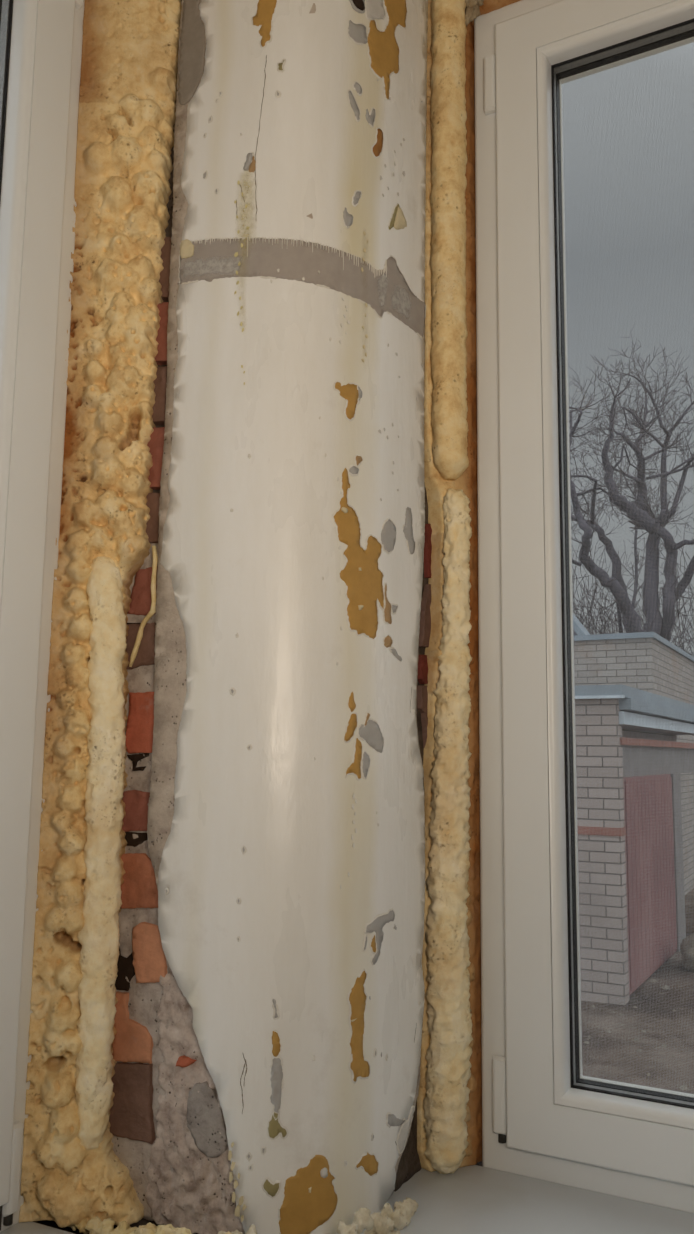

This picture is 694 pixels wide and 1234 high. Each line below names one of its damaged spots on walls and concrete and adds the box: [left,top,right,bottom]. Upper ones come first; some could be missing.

peeling [251,0,277,49]
peeling [346,0,422,230]
flaking render [109,152,432,1234]